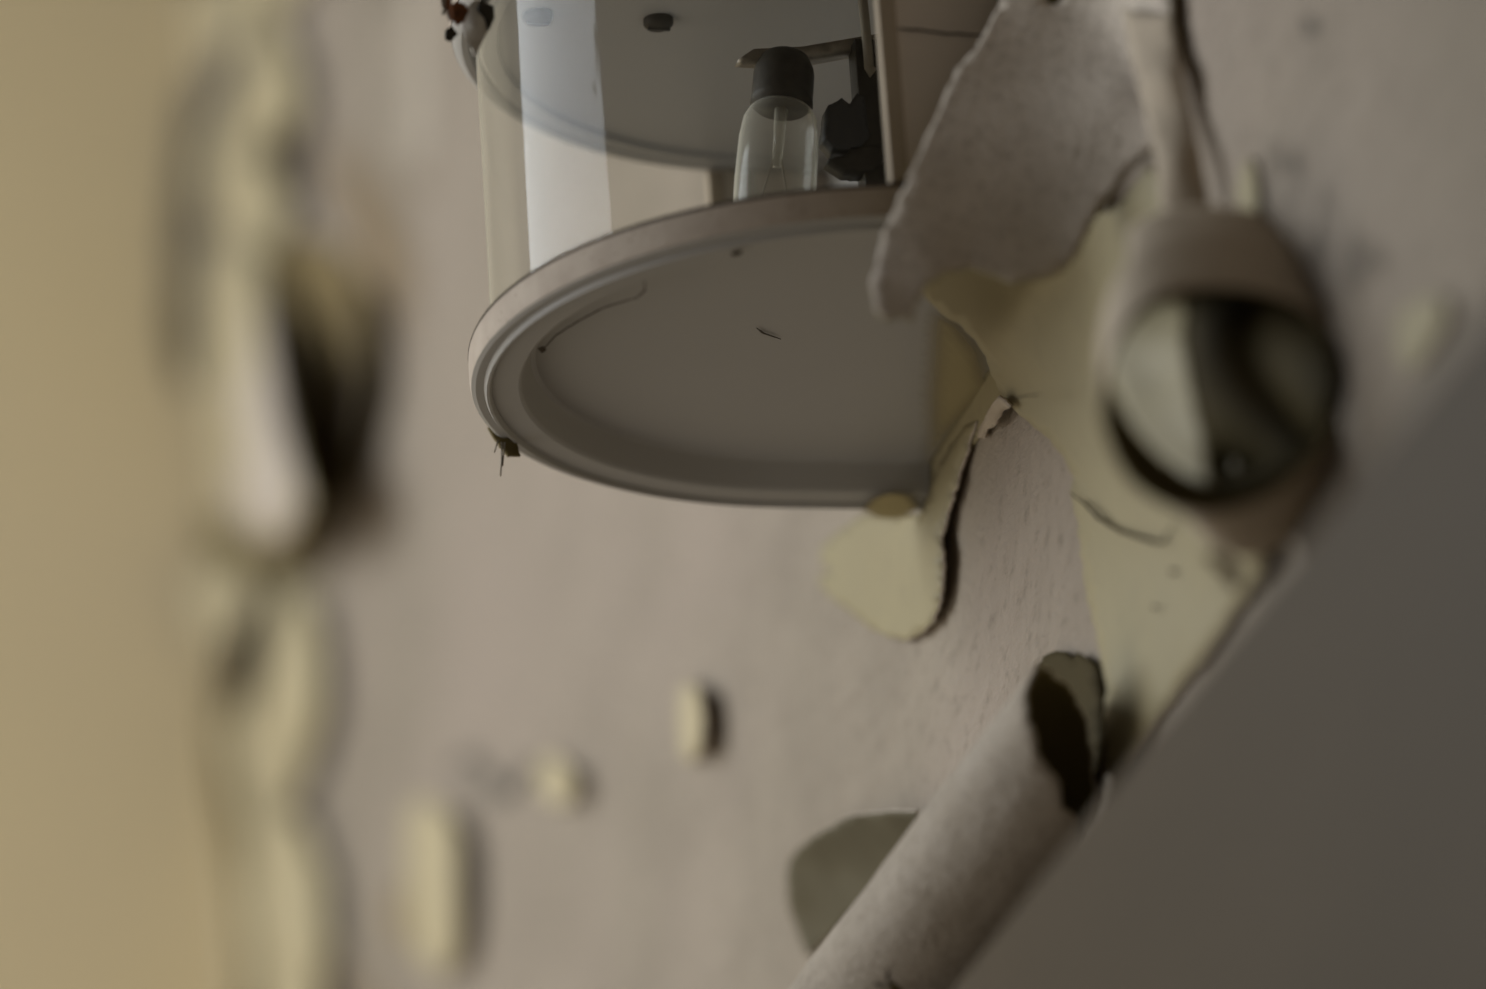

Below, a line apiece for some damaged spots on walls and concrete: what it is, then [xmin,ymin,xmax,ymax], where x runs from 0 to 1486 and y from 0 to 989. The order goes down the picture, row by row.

peeling [679,681,708,762]
peeling [818,0,1267,780]